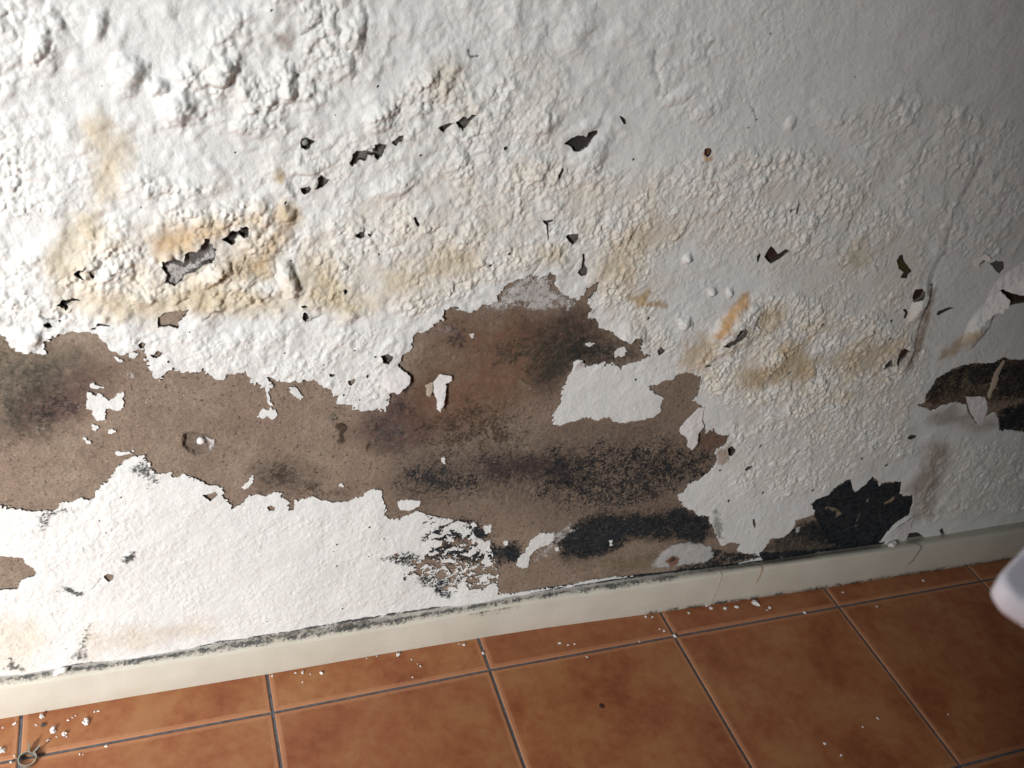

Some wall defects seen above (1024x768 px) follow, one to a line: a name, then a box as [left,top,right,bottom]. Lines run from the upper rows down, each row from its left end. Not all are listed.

spalling [162,238,215,284]
peeling [917,357,1024,432]
peeling [0,272,922,594]
leakage [381,550,419,567]